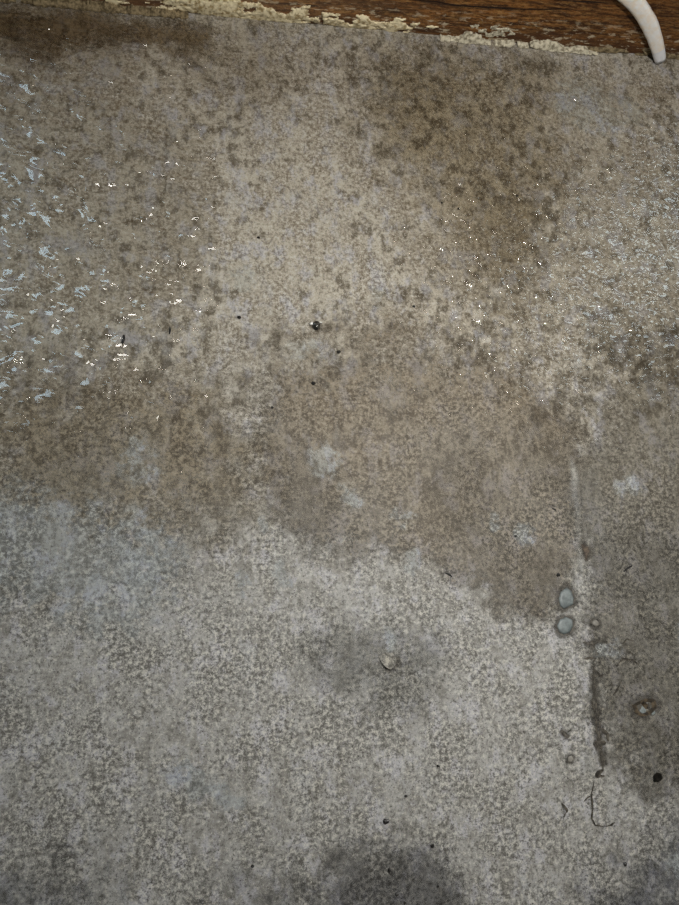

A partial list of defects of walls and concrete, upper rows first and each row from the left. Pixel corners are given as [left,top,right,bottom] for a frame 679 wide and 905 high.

damp [0,4,210,61]
peeling [145,0,439,33]
peeling [470,24,515,38]
damp [0,313,679,801]
crack [559,728,571,739]
crack [561,638,638,827]
damp [328,854,460,905]